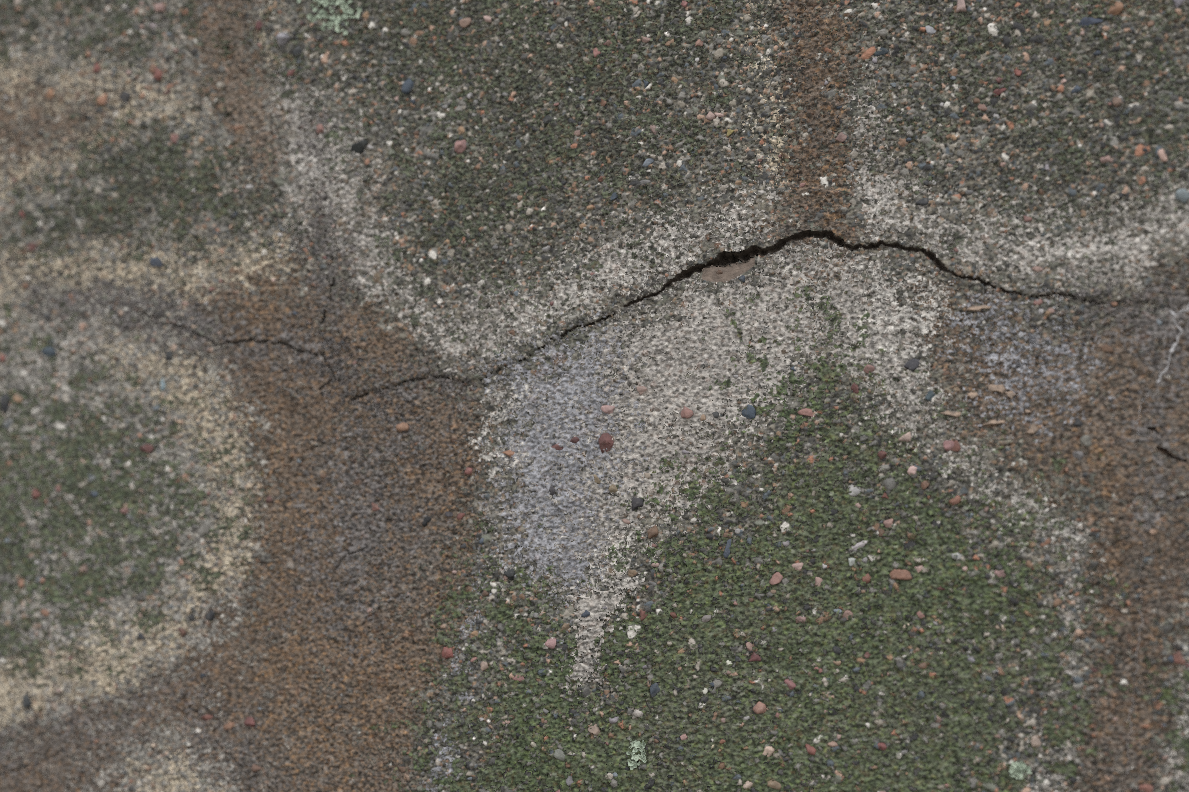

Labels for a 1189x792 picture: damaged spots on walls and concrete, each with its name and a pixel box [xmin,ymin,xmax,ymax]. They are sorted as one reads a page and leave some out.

crack [128,230,1189,792]